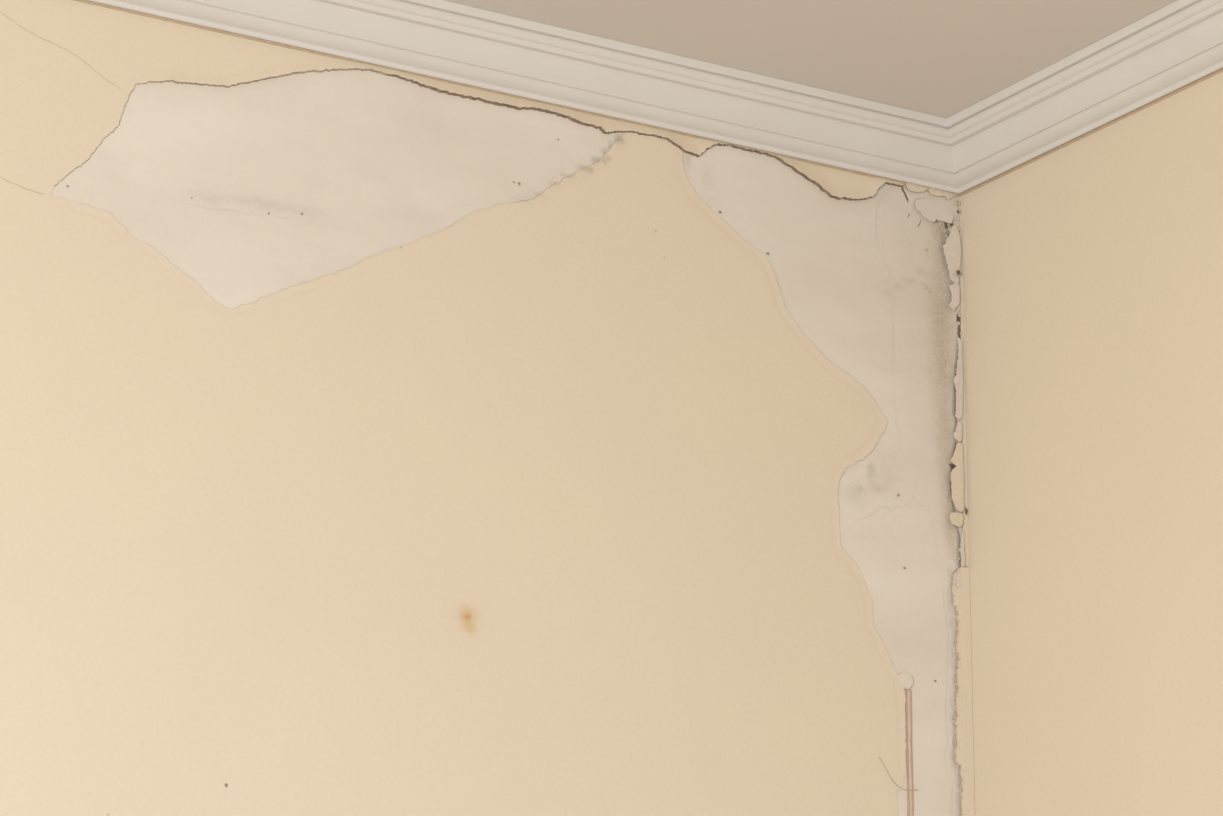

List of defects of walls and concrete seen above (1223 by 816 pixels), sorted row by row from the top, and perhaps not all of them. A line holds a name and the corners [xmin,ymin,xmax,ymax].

peeling [51,49,975,816]
leakage [838,186,962,578]